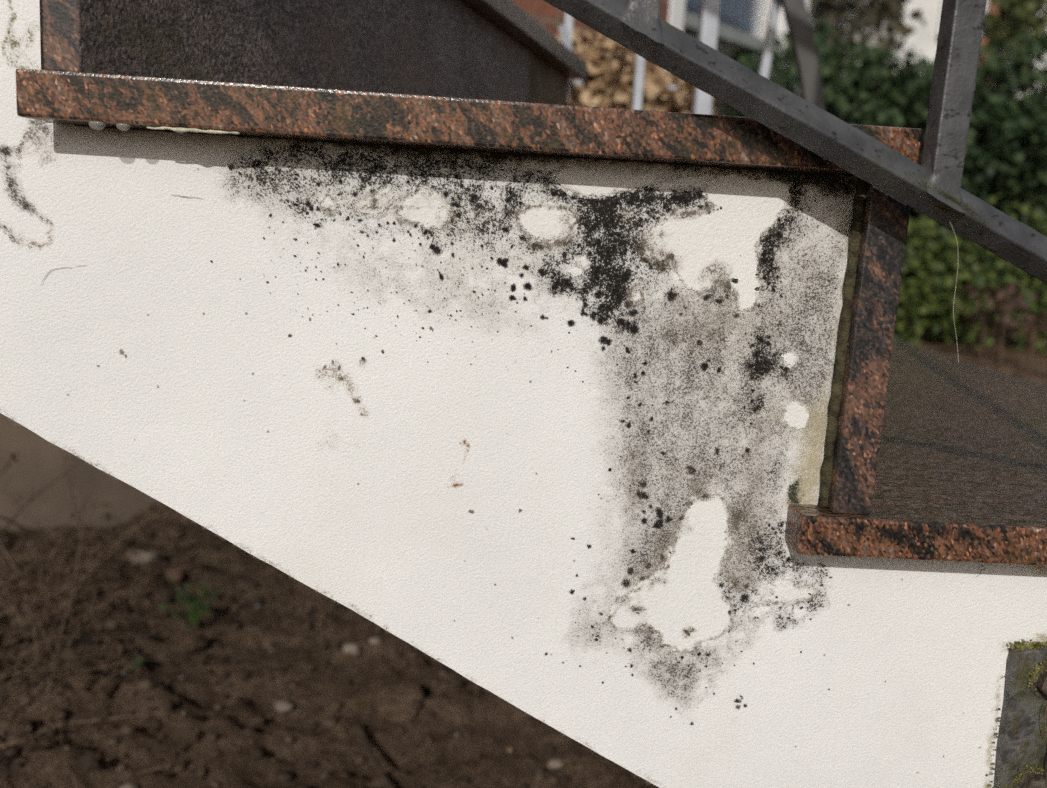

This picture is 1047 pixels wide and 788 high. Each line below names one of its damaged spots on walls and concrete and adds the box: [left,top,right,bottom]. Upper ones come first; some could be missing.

damp [0,119,59,249]
damp [225,138,854,717]